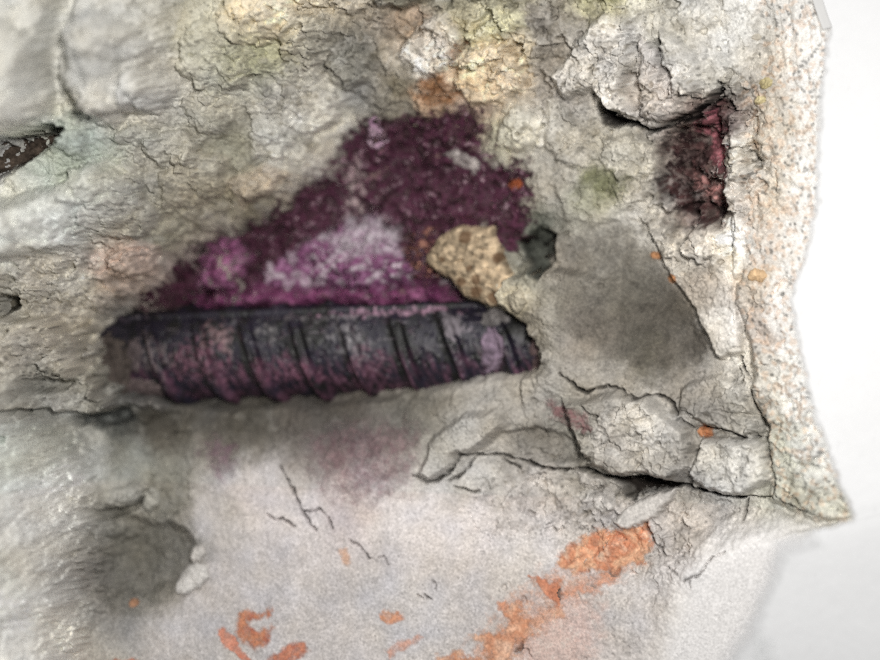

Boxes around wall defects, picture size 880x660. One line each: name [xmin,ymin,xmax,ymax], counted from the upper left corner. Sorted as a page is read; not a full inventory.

spalling [426,222,514,306]
spalling [524,231,556,279]
spalling [508,289,527,315]
crack [574,382,677,408]
crack [431,453,643,492]